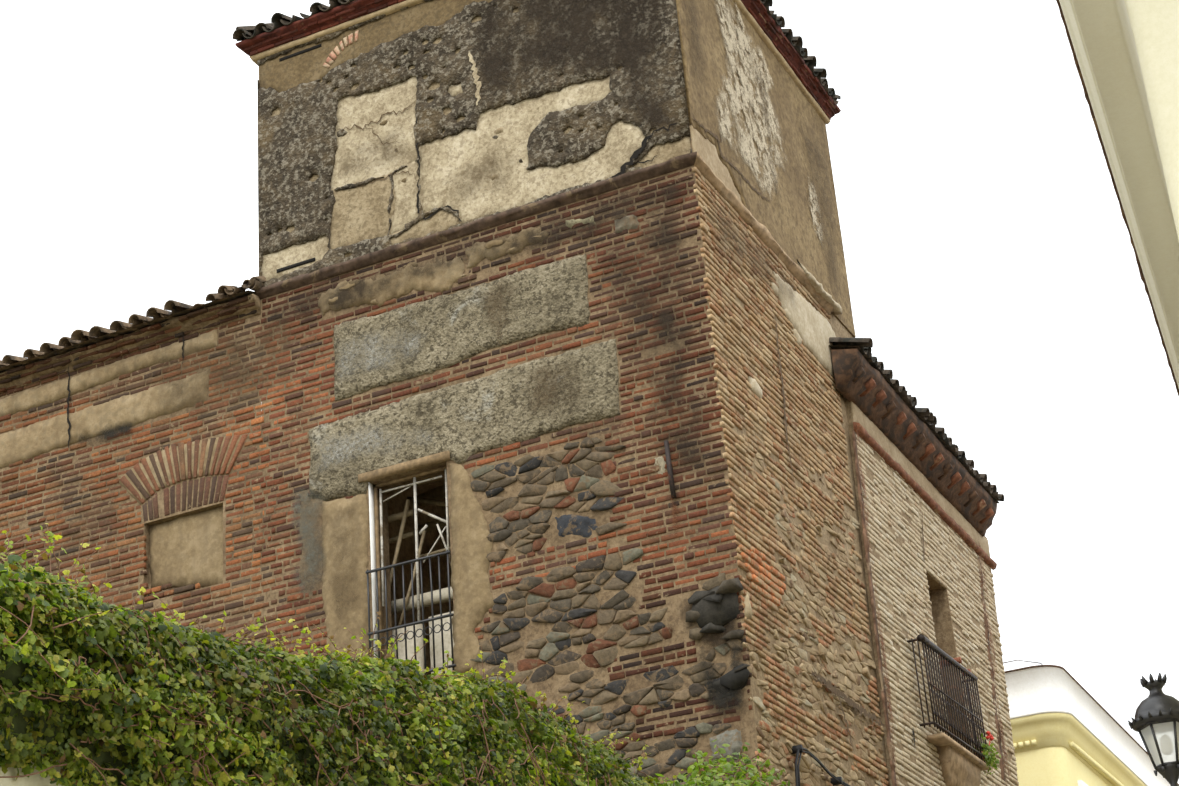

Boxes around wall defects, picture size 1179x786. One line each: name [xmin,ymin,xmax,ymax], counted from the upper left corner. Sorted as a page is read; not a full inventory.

crack [334,103,461,221]
spalling [261,0,782,283]
crack [65,367,73,448]